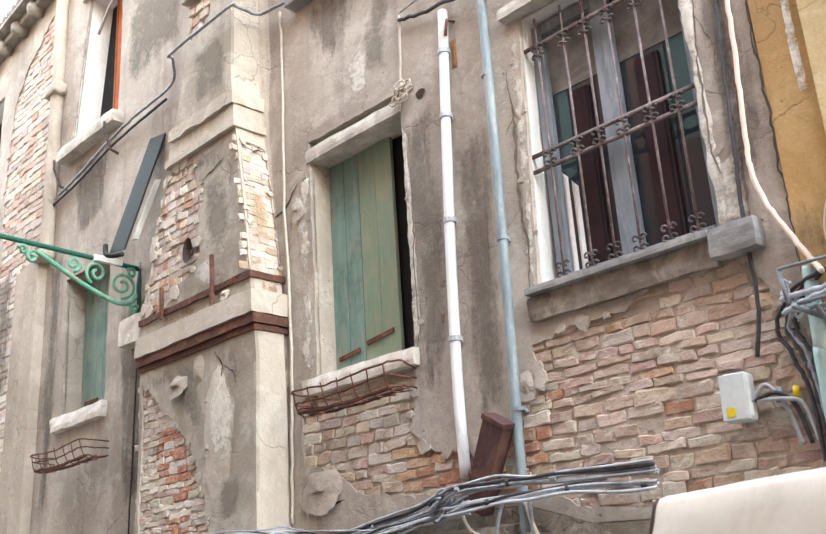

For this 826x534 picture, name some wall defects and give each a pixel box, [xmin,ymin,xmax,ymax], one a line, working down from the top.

flaking render [188,0,212,40]
flaking render [0,18,55,475]
flaking render [140,158,204,318]
peeling [229,134,283,285]
crack [692,0,751,216]
crack [745,0,801,270]
flaking render [134,383,210,534]
flaking render [302,369,469,498]
flaking render [469,437,478,468]
flaking render [498,433,517,493]